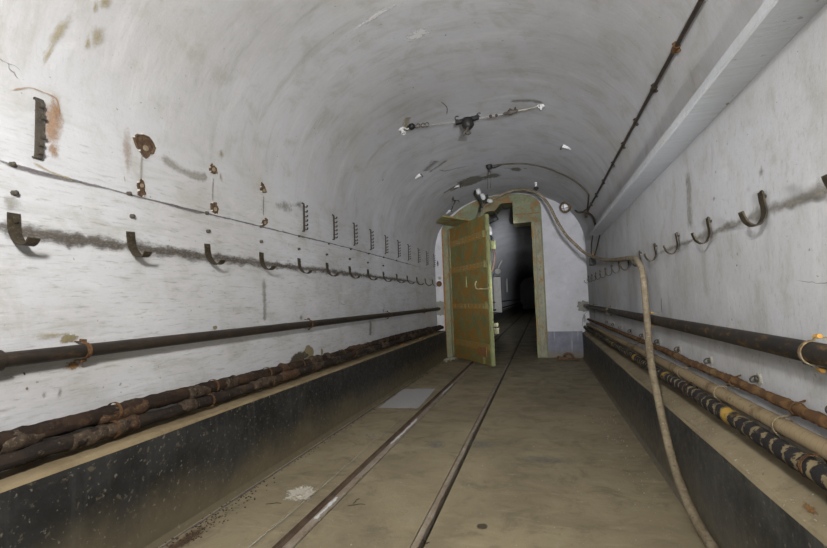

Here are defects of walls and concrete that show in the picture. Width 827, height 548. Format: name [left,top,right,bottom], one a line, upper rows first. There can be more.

rust [14,87,60,155]
water stain [1,158,408,264]